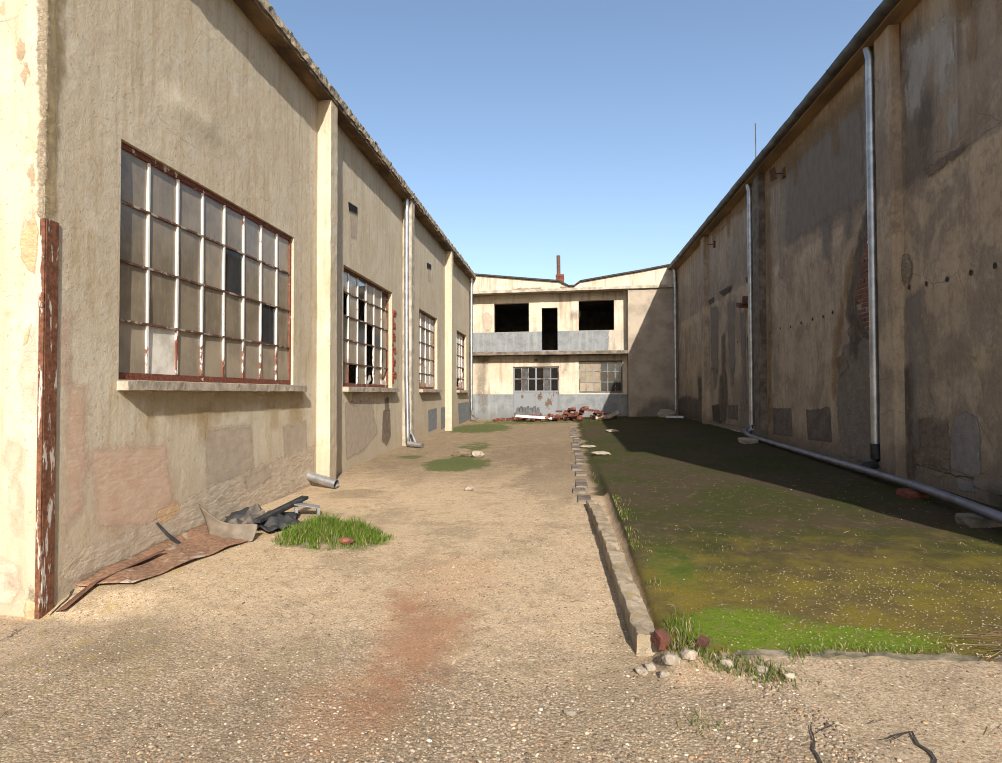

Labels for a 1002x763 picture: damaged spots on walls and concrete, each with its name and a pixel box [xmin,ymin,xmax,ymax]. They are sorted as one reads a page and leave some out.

flaking render [15,0,48,273]
flaking render [854,226,869,337]